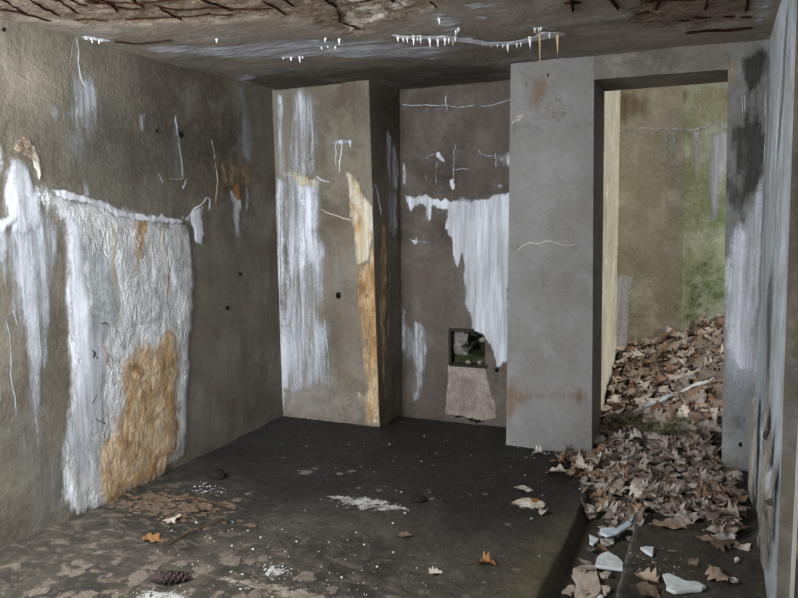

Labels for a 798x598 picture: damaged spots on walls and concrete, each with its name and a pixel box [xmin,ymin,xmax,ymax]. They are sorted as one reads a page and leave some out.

spalling [14,137,42,180]
damp [70,36,114,116]
spalling [0,0,437,35]
damp [151,14,566,421]
damp [724,10,790,392]
damp [0,161,211,514]
rust [100,331,180,503]
rust [357,224,390,423]
spalling [453,331,471,355]
peeling [445,365,496,423]